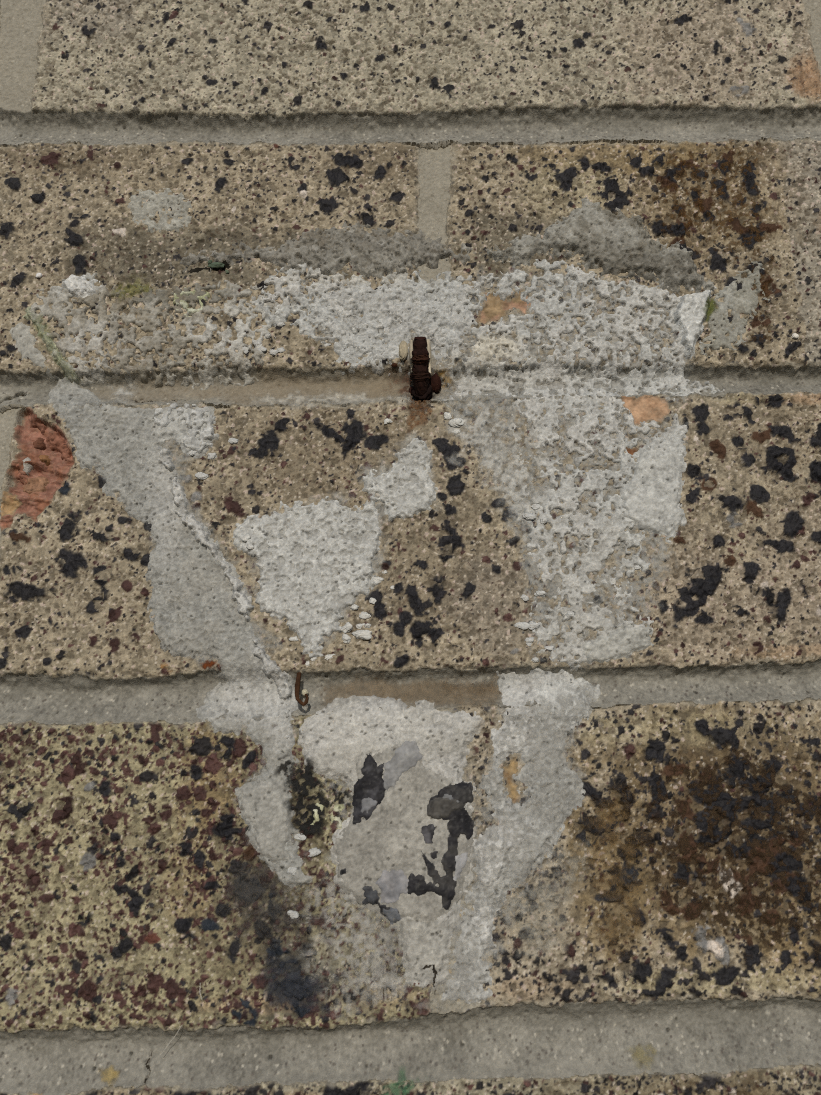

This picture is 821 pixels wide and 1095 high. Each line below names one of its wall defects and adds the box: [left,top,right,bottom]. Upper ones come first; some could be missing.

spalling [0,407,75,532]
leakage [646,749,821,947]